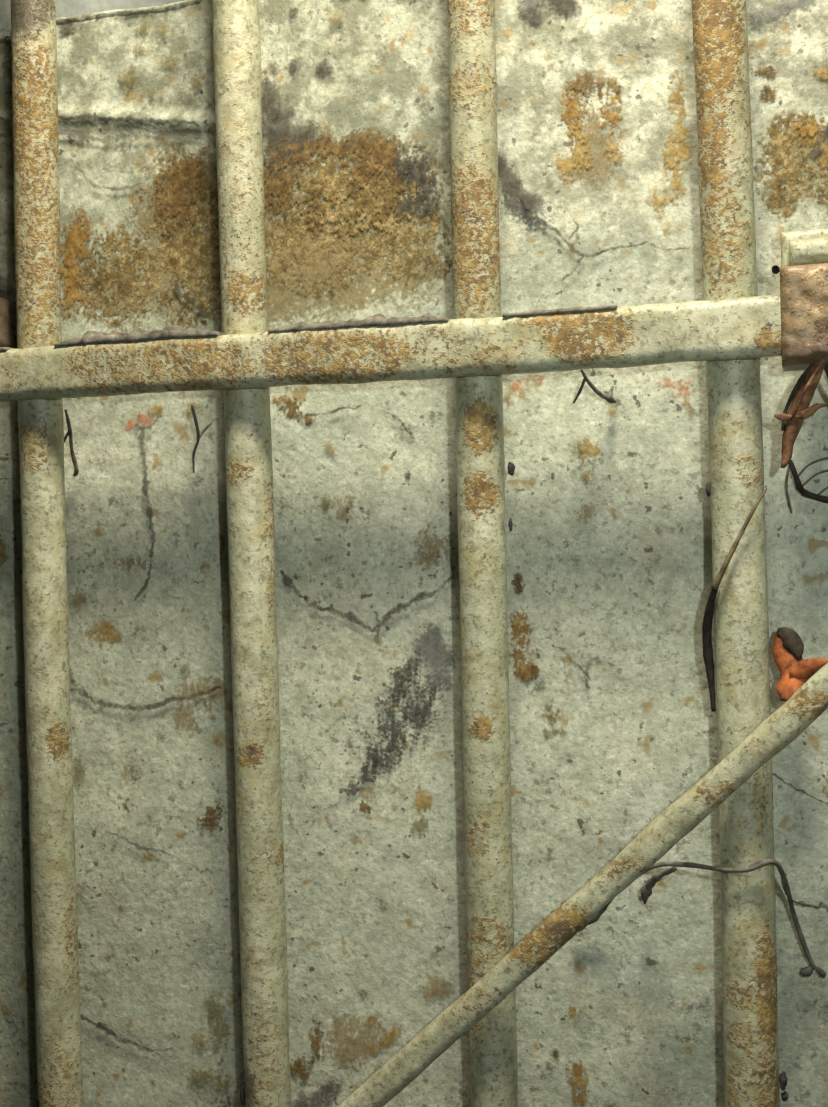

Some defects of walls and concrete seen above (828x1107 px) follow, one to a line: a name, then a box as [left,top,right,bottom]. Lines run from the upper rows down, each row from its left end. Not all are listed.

crack [58,113,201,191]
corrosion [551,69,623,189]
corrosion [752,65,776,101]
corrosion [754,111,828,217]
corrosion [60,142,222,332]
corrosion [264,126,453,327]
crack [519,195,688,281]
crack [135,419,158,601]
crack [280,566,455,636]
crack [69,669,221,711]
mould [340,623,455,797]
corrosion [553,1049,591,1105]